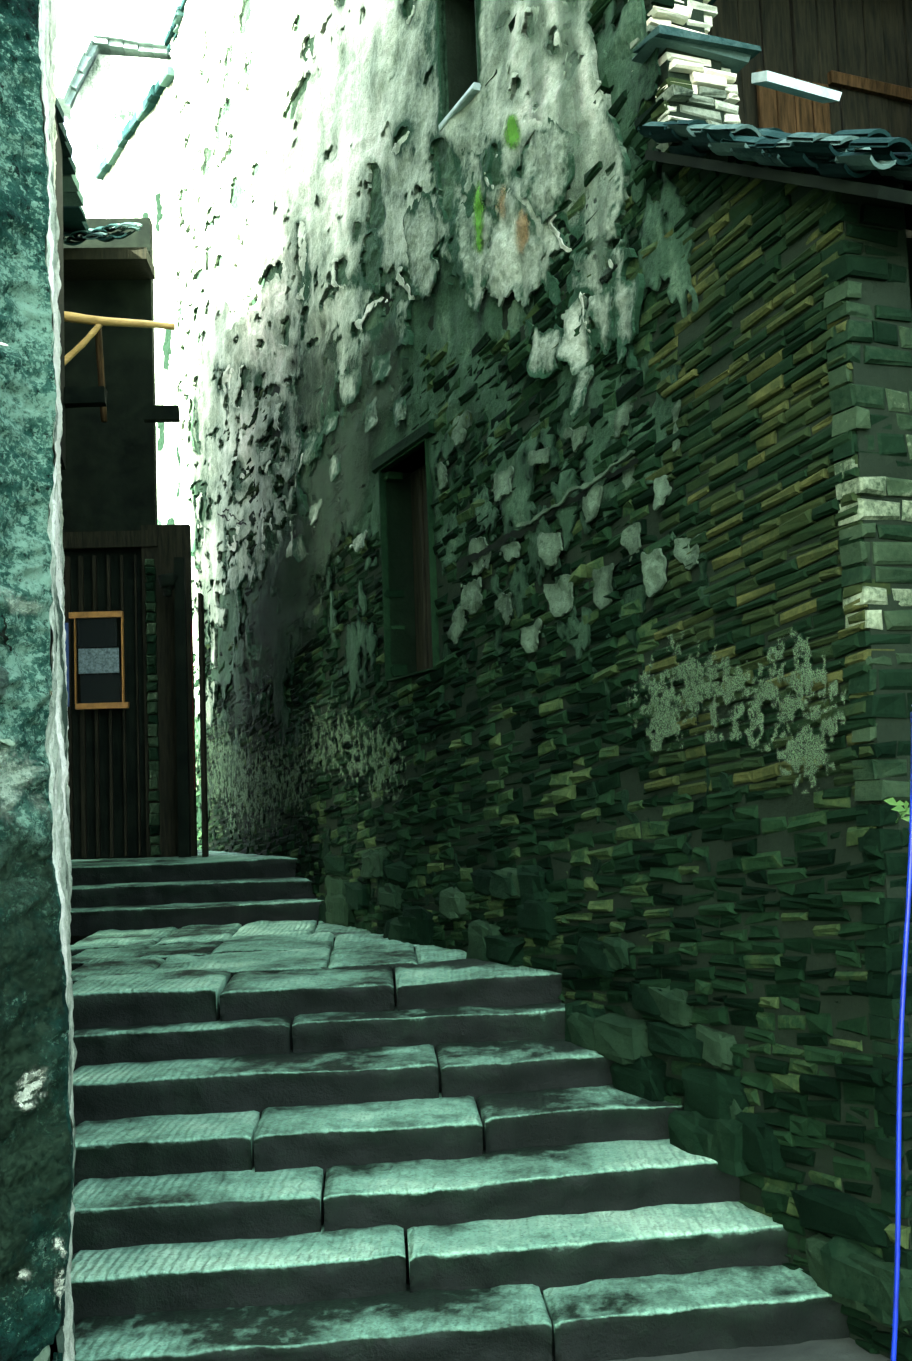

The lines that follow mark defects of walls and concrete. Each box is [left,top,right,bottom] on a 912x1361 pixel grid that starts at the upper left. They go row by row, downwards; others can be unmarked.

spalling [281,10,318,121]
spalling [252,221,309,300]
peeling [331,117,636,452]
spalling [162,295,187,371]
spalling [218,364,251,409]
spalling [195,456,245,551]
peeling [225,350,407,580]
peeling [491,447,551,501]
peeling [582,485,603,523]
peeling [653,475,672,511]
peeling [446,532,574,653]
peeling [592,522,700,609]